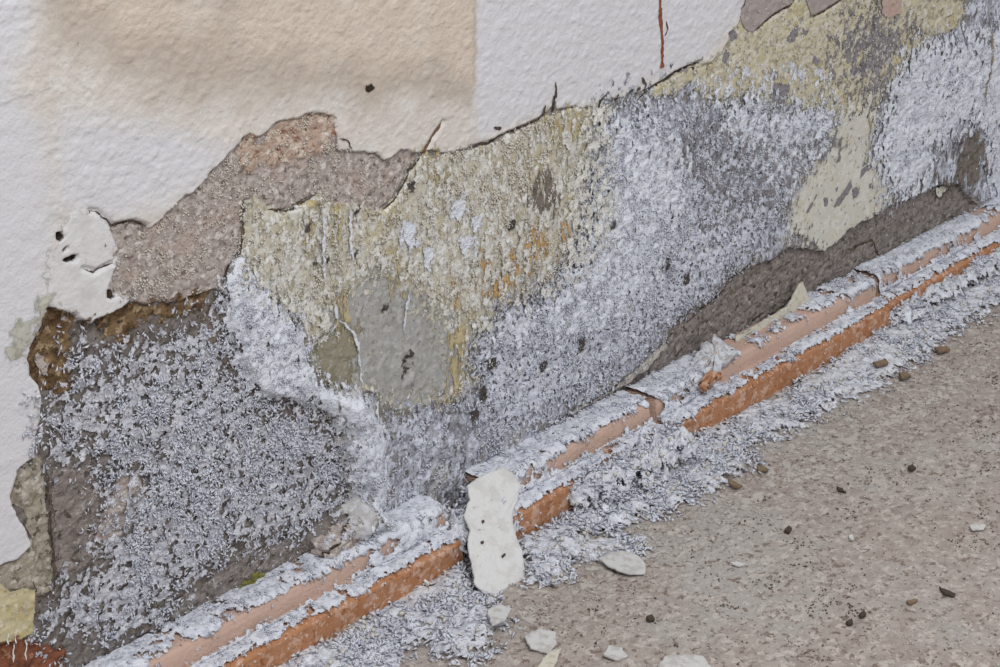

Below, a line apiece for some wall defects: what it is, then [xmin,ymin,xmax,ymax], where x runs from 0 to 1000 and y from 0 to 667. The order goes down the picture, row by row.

corrosion [658,0,668,68]
peeling [651,0,966,121]
flaking render [0,97,628,667]
leakage [5,81,855,667]
flaking render [605,183,977,394]
leakage [623,0,1000,425]
peeling [806,164,874,213]
peeling [658,654,711,667]